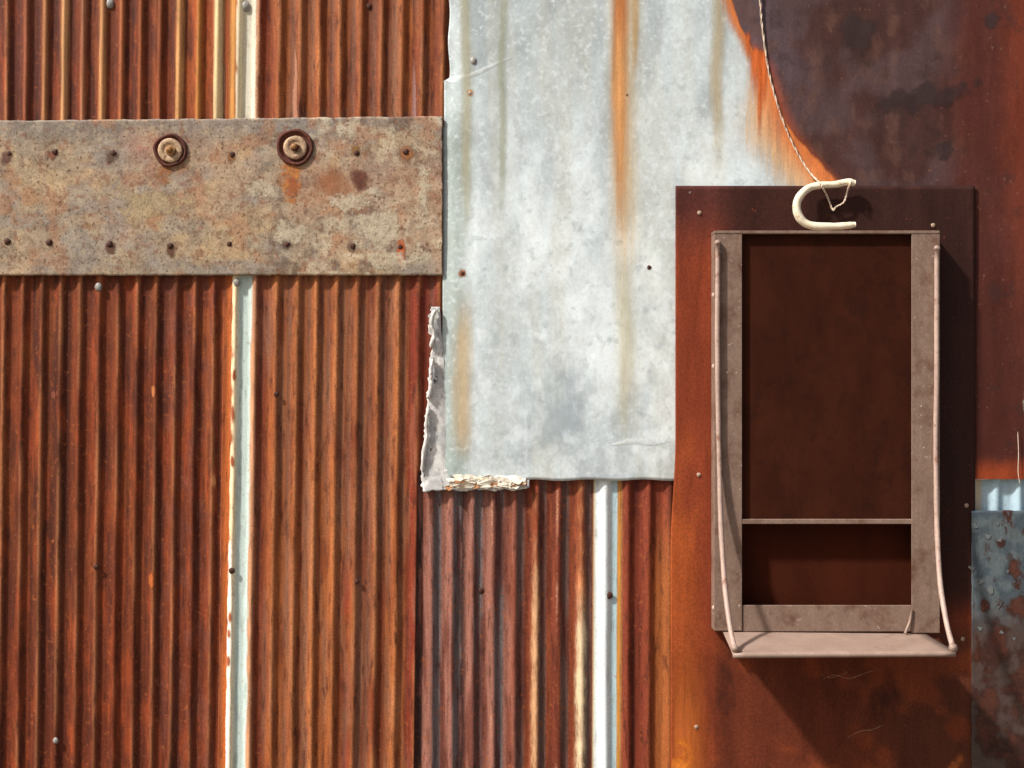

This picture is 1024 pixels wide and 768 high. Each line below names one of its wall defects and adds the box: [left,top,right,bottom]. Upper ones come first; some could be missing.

rust [612,0,627,200]
rust [281,162,302,203]
rust [351,170,366,190]
rust [723,0,1024,479]
peeling [445,474,528,491]
peeling [973,522,1021,580]
peeling [969,566,1024,768]